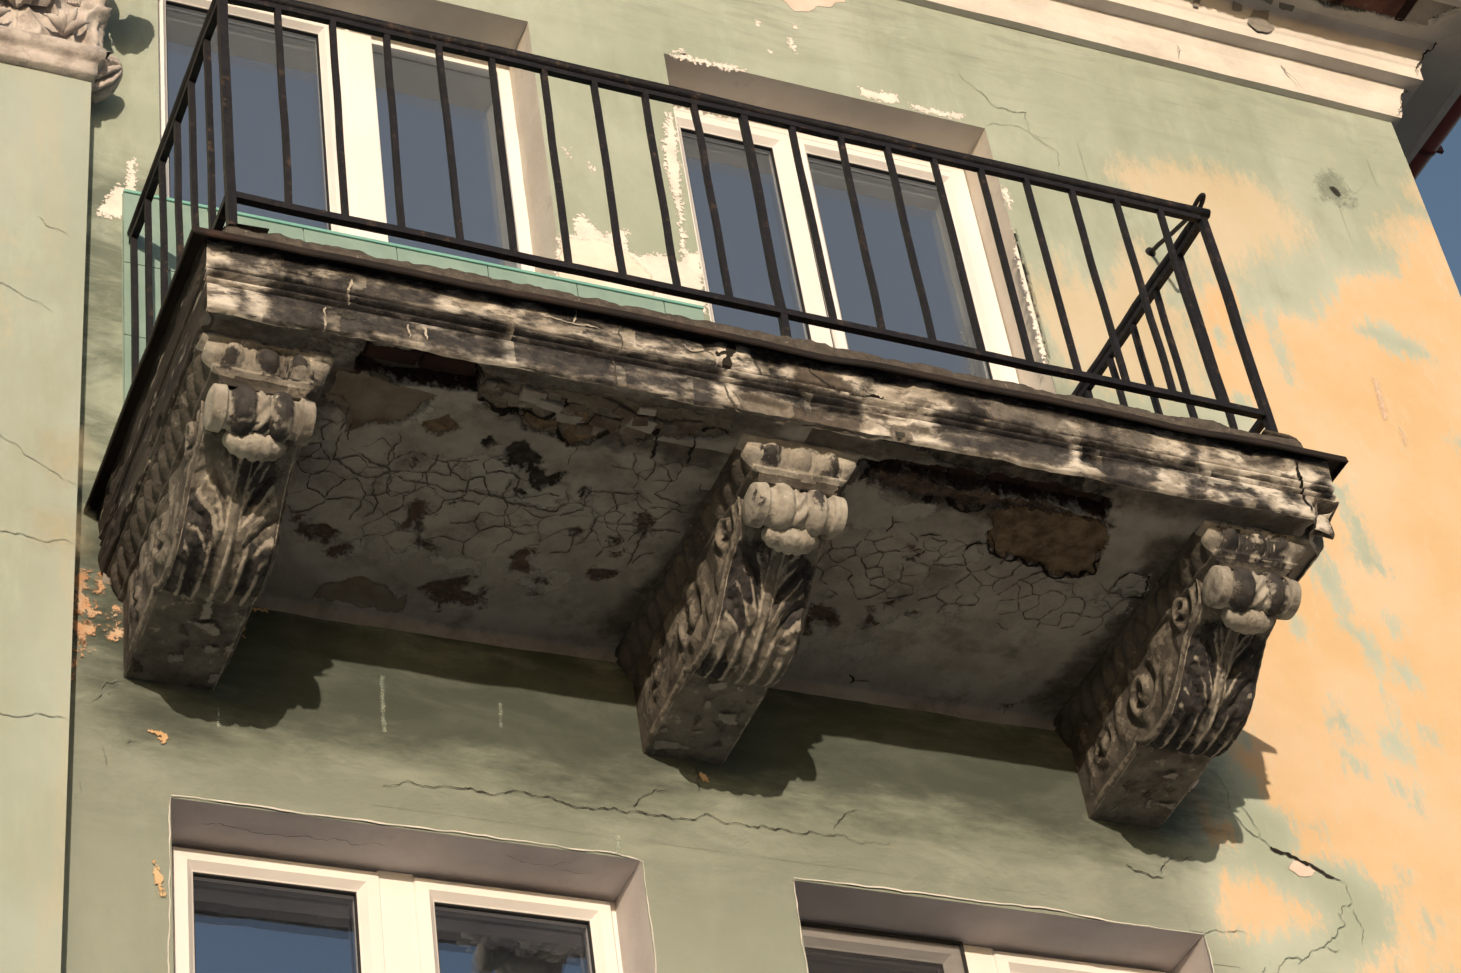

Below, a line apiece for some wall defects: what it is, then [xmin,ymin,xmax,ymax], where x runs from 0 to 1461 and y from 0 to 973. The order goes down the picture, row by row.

spalling [766,0,845,54]
flaking render [1318,0,1460,26]
flaking render [552,112,710,315]
crack [323,279,353,332]
flaking render [211,264,507,506]
spalling [583,324,861,436]
crack [286,310,884,593]
peeling [71,568,124,681]
crack [816,495,1152,641]
crack [0,712,71,723]
crack [389,770,889,844]
crack [1208,769,1364,973]